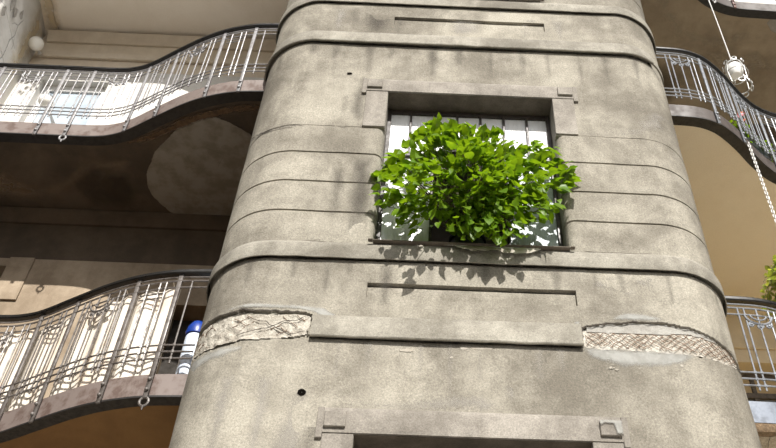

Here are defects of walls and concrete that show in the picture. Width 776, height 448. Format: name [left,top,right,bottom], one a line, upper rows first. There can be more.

spalling [185,304,333,384]
spalling [576,314,742,374]